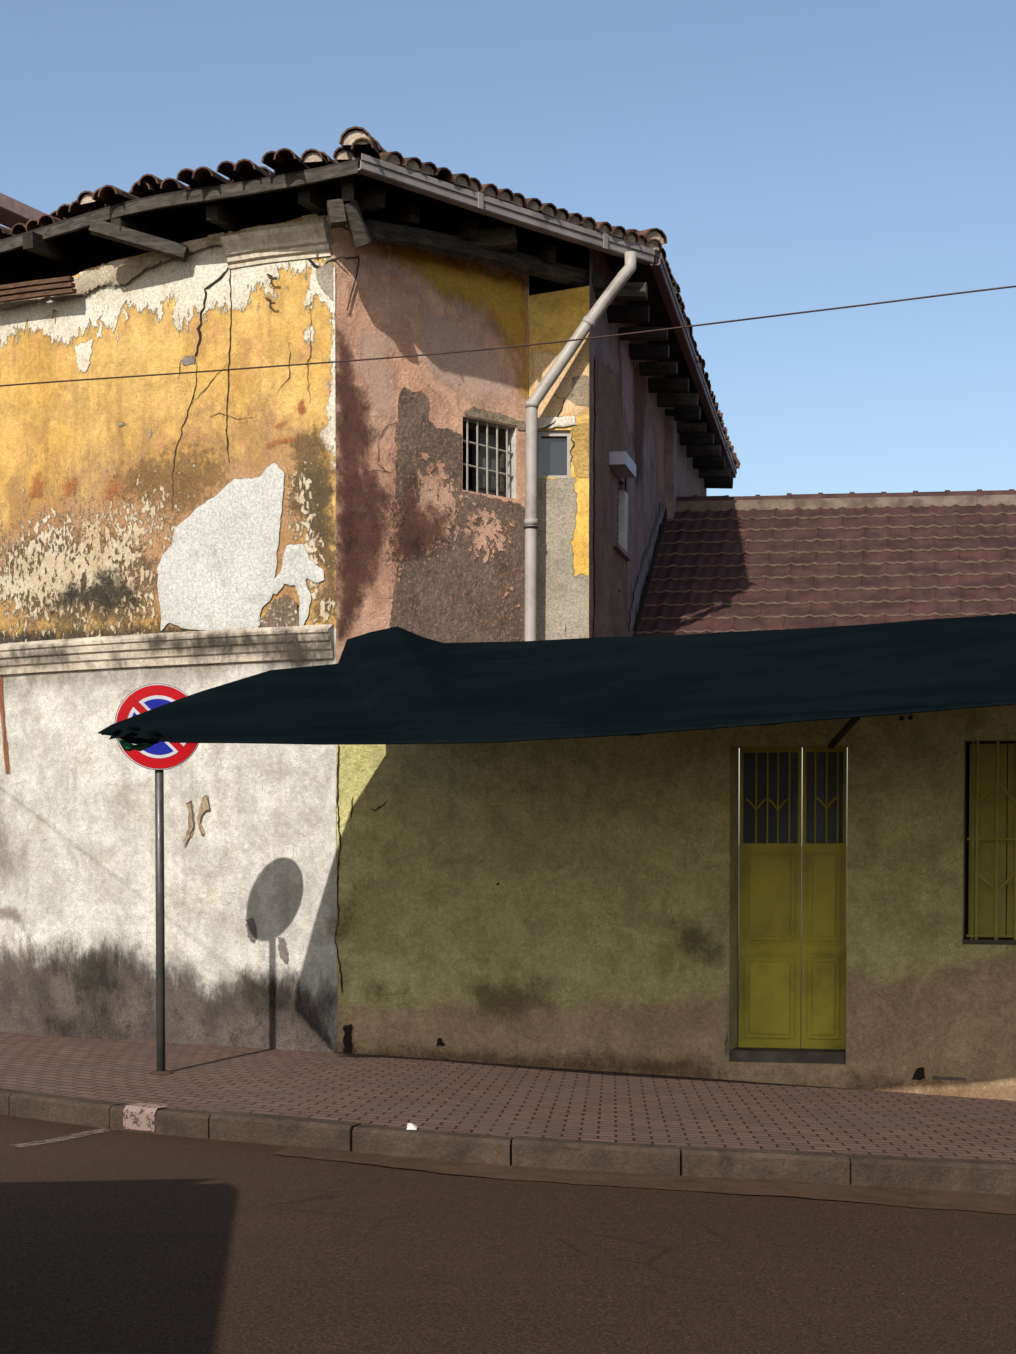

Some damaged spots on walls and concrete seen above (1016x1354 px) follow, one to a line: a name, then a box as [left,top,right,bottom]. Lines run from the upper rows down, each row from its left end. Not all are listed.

peeling [0,214,342,471]
water stain [0,329,392,644]
crack [171,264,251,509]
crack [277,293,312,403]
rust [0,675,9,773]
water stain [0,947,711,1077]